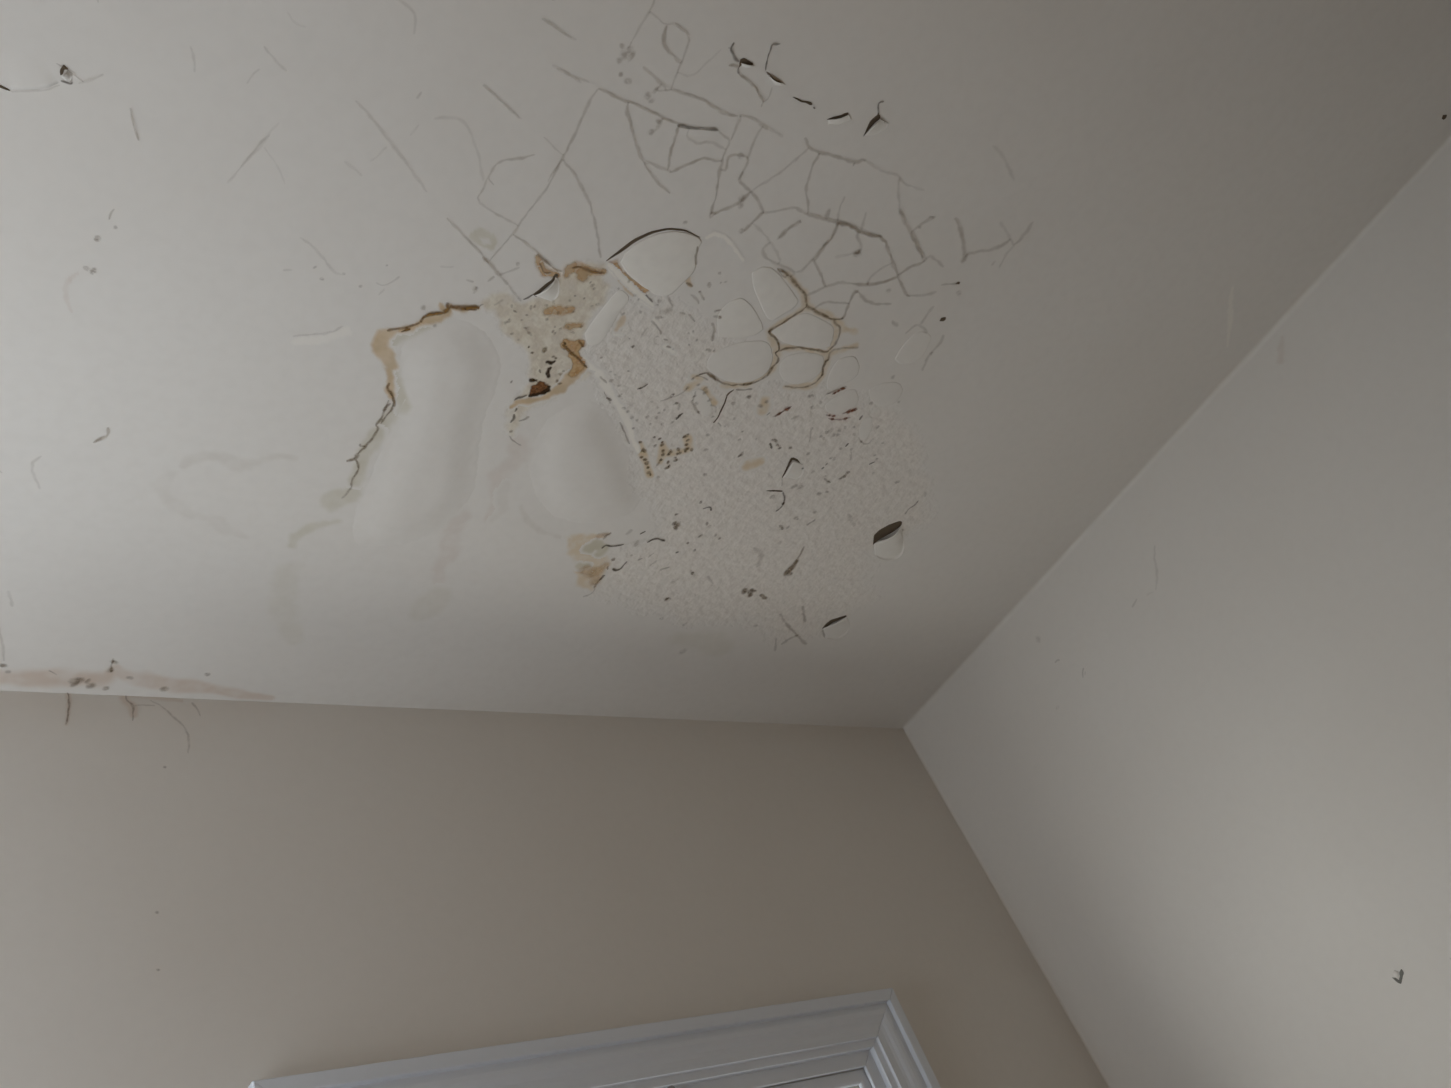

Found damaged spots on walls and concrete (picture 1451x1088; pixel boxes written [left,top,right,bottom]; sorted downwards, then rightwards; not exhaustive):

crack [674,124,718,137]
spalling [476,228,859,439]
peeling [767,457,804,511]
peeling [873,521,905,560]
peeling [822,615,850,640]